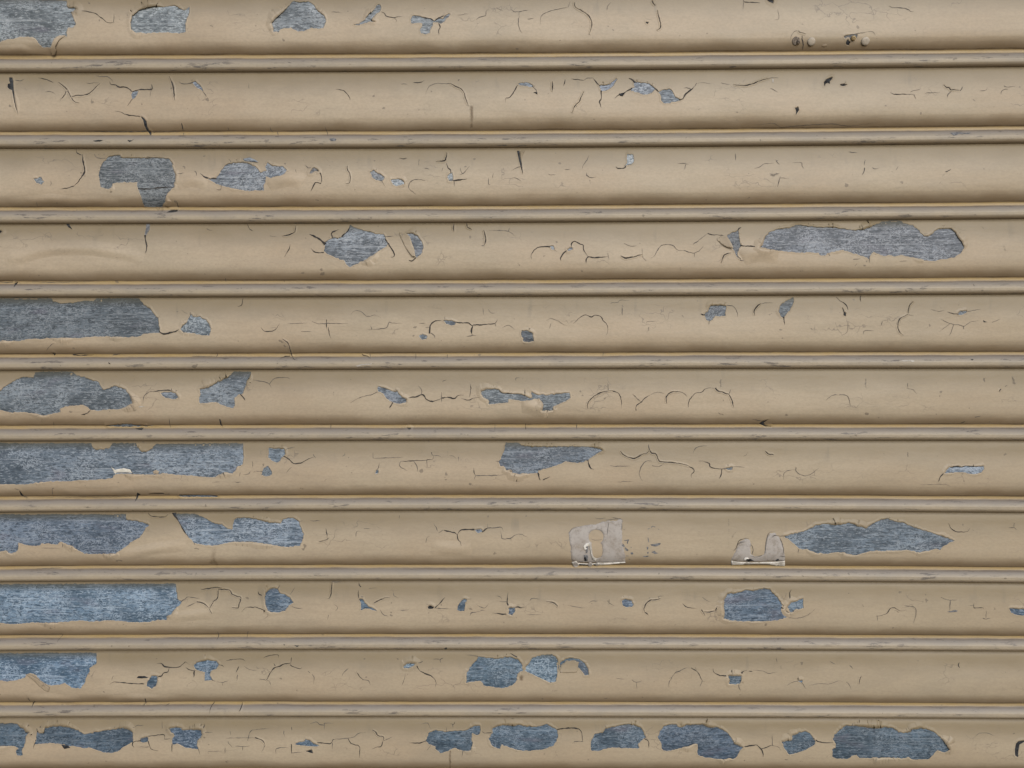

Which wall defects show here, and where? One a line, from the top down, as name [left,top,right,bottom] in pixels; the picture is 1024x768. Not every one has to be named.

peeling [97,140,182,212]
peeling [717,220,968,264]
peeling [0,298,213,348]
peeling [0,371,182,429]
crack [576,387,760,428]
peeling [0,442,246,487]
crack [610,444,700,482]
peeling [0,513,151,560]
peeling [774,516,956,561]
peeling [0,583,194,629]
peeling [0,652,98,692]
peeling [414,717,955,765]